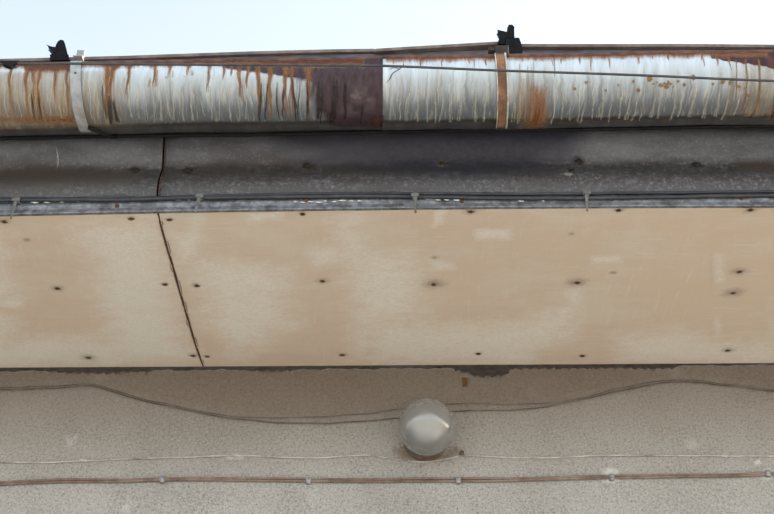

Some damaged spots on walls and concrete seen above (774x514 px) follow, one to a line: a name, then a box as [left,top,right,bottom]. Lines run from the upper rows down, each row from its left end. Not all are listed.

rust [0,65,76,128]
rust [81,65,136,124]
rust [186,57,495,127]
rust [507,52,774,114]